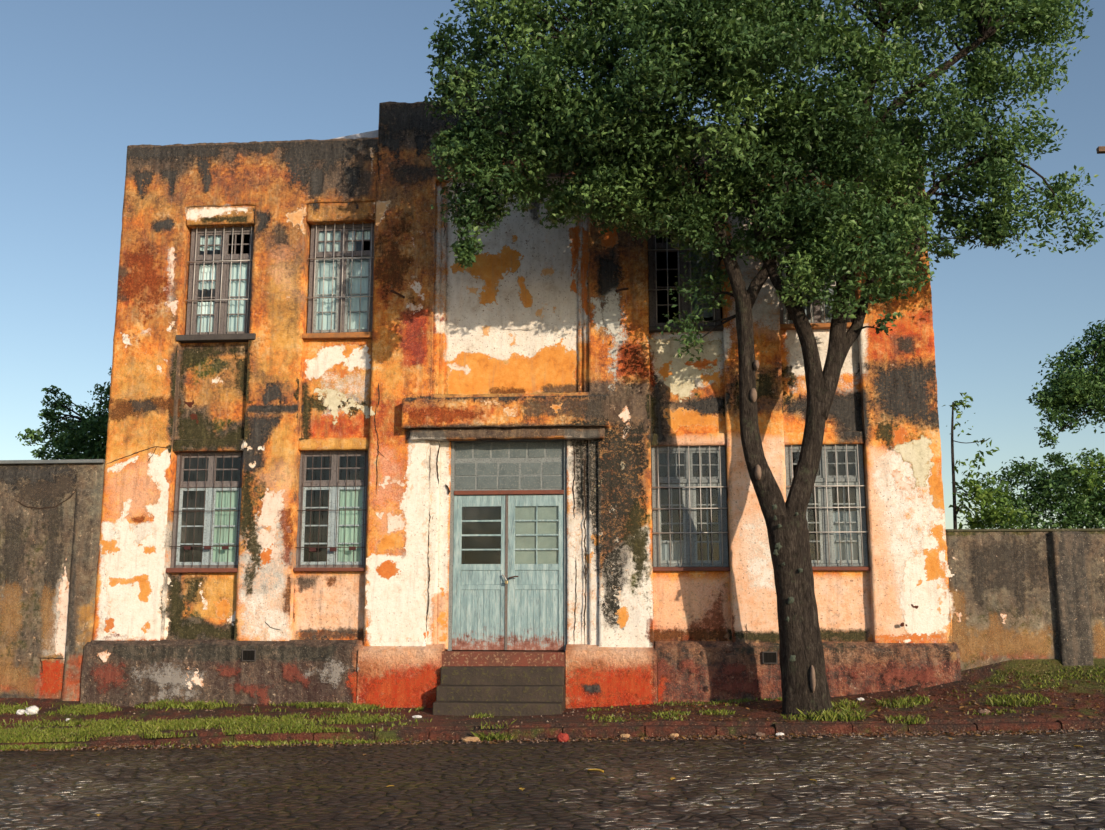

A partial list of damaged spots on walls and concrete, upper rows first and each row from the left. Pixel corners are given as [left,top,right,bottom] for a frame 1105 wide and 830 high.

leakage [126,101,529,213]
leakage [109,340,366,548]
peeling [299,344,375,425]
peeling [445,329,581,394]
leakage [403,256,671,630]
peeling [647,336,727,432]
leakage [829,337,939,450]
leakage [0,497,70,662]
peeling [91,446,171,695]
leakage [160,574,238,641]
peeling [298,440,448,642]
peeling [869,426,957,643]